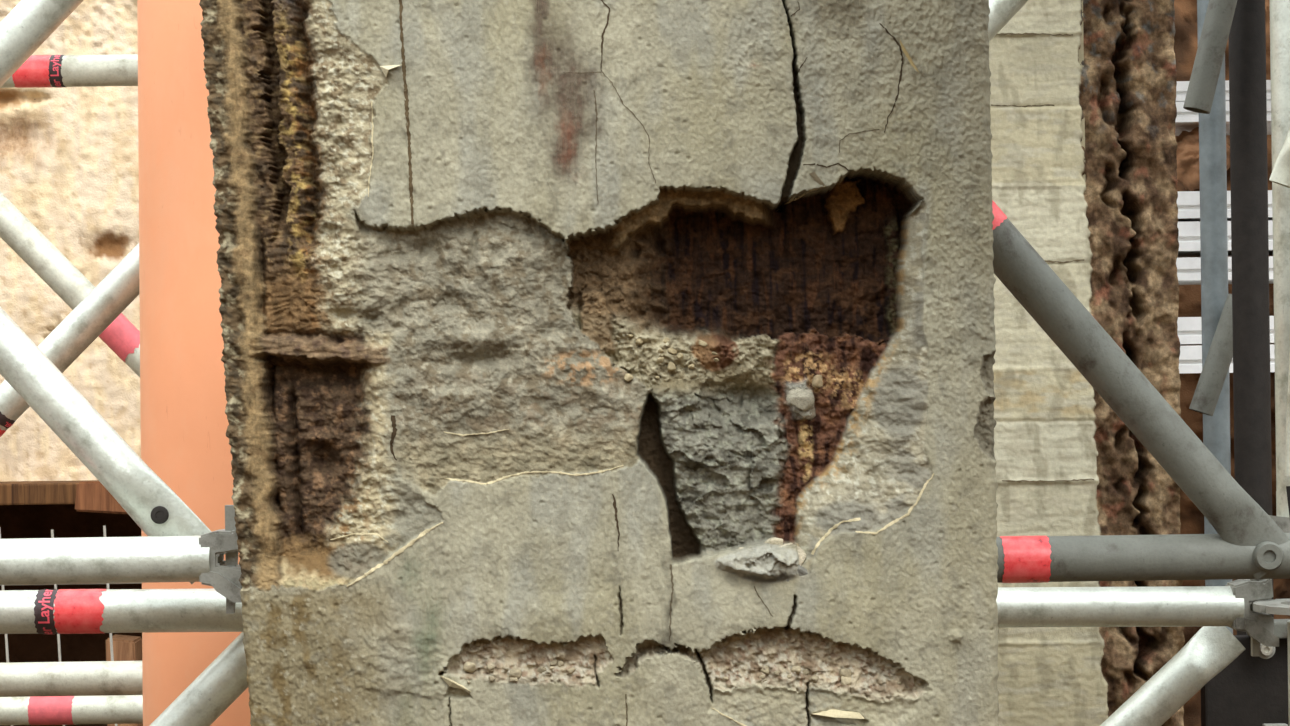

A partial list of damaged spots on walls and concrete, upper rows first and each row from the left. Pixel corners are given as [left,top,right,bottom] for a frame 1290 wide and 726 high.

crack [399,0,414,224]
rust [533,0,593,172]
crack [566,0,656,203]
crack [779,0,919,203]
spalling [199,0,934,592]
spalling [438,625,929,726]